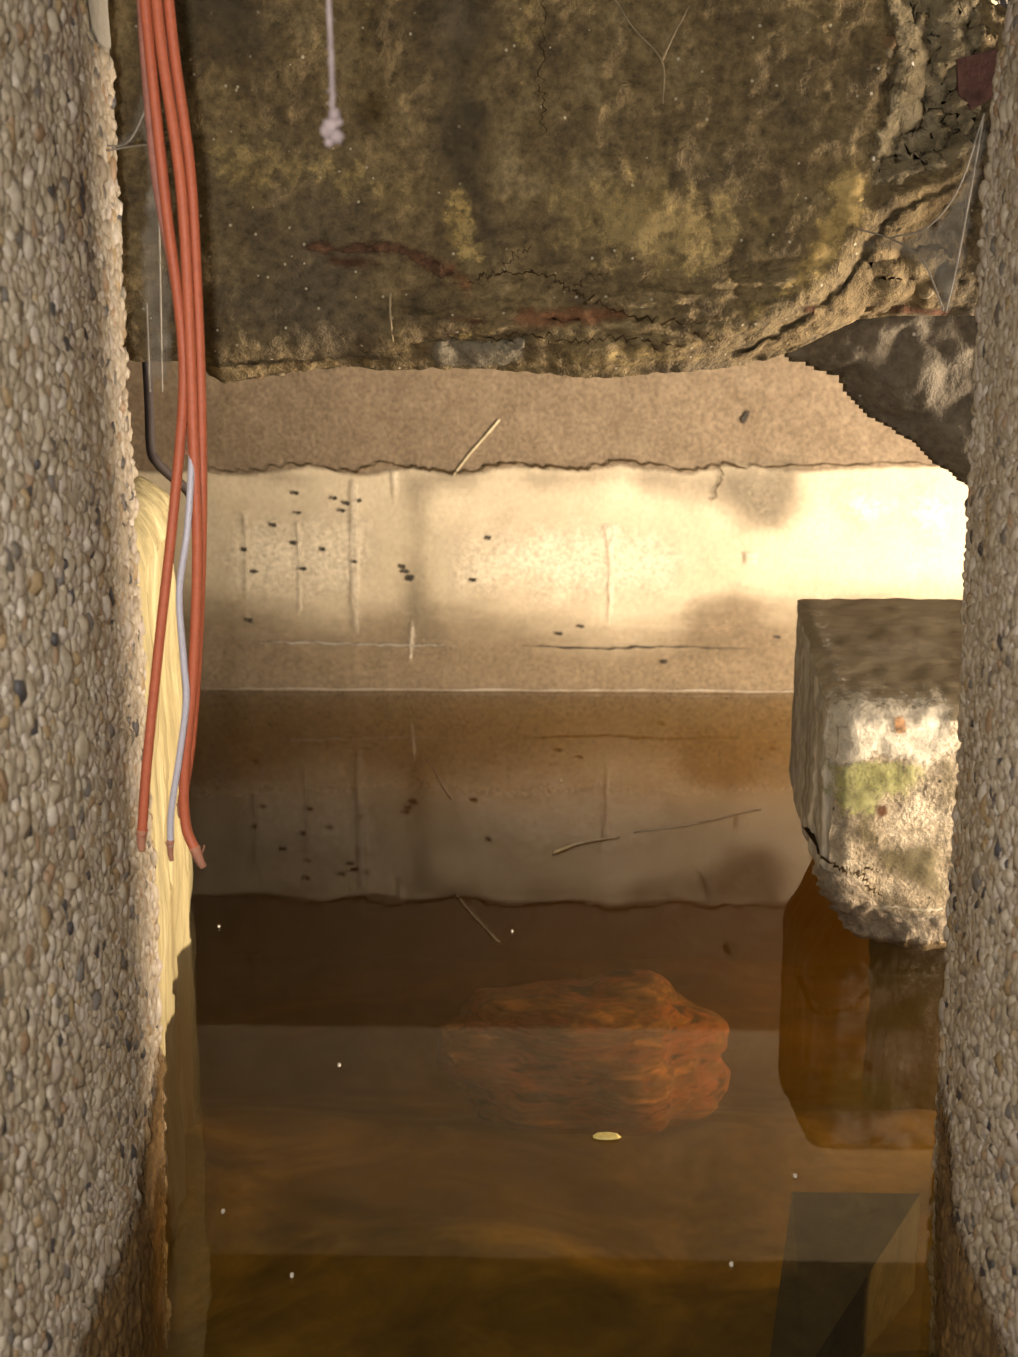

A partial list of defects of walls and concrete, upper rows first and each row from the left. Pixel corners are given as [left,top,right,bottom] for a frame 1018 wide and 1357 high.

spalling [871,0,998,186]
rust [306,241,470,288]
damp [125,360,188,472]
damp [206,348,935,517]
damp [882,843,944,896]